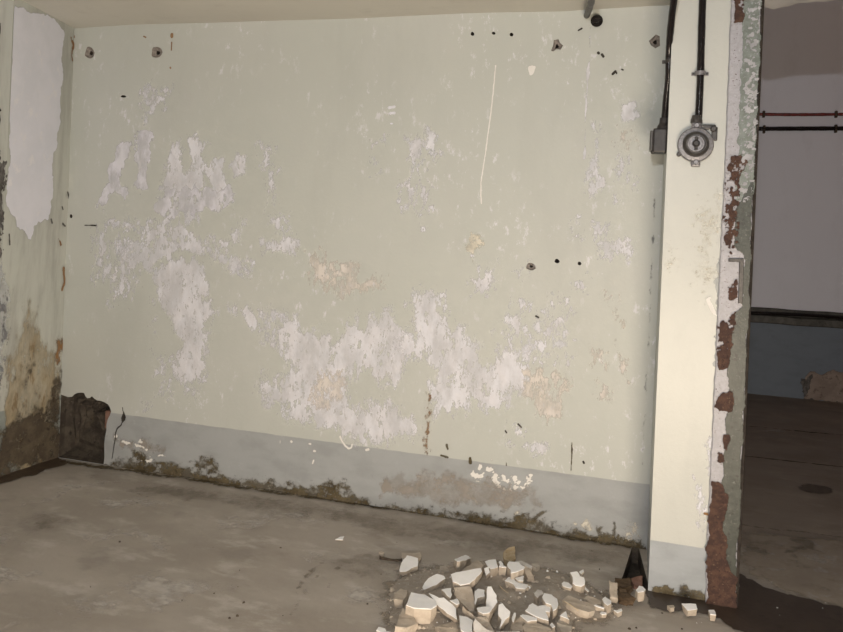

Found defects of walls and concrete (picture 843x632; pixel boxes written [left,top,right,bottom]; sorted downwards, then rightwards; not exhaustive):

rust [734,0,745,23]
peeling [90,83,300,387]
rust [722,155,748,254]
rust [728,279,738,301]
spalling [59,393,111,464]
water stain [0,156,646,549]
peeling [254,287,576,451]
rust [714,391,734,412]
rust [717,434,731,463]
rust [716,312,736,370]
peeling [804,370,843,403]
rust [703,481,738,608]